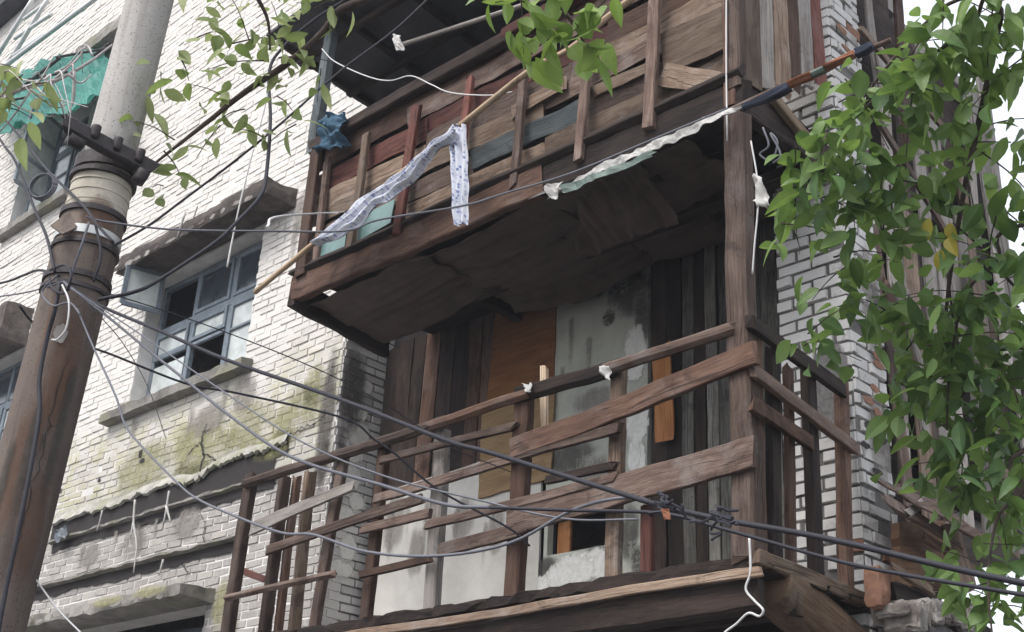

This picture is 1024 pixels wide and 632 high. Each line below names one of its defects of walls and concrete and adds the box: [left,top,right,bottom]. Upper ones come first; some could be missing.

mould [593,270,650,339]
leakage [188,379,254,433]
crack [187,424,216,472]